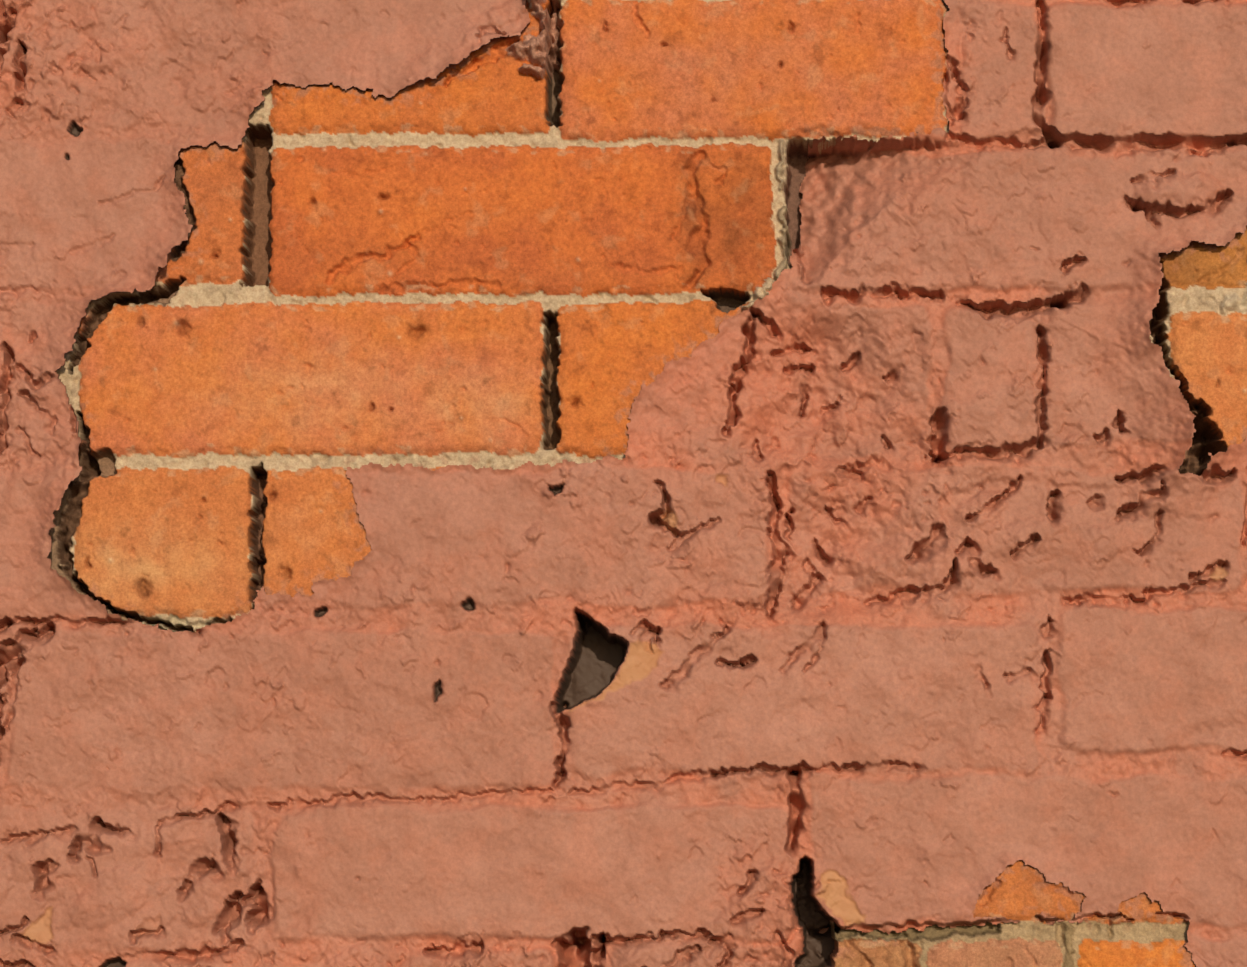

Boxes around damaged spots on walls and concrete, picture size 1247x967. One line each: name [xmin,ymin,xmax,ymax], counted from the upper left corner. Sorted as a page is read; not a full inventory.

peeling [29,0,985,655]
peeling [1117,193,1247,504]
spalling [554,609,629,716]
spalling [658,626,758,690]
spalling [777,623,828,676]
peeling [828,850,1196,967]